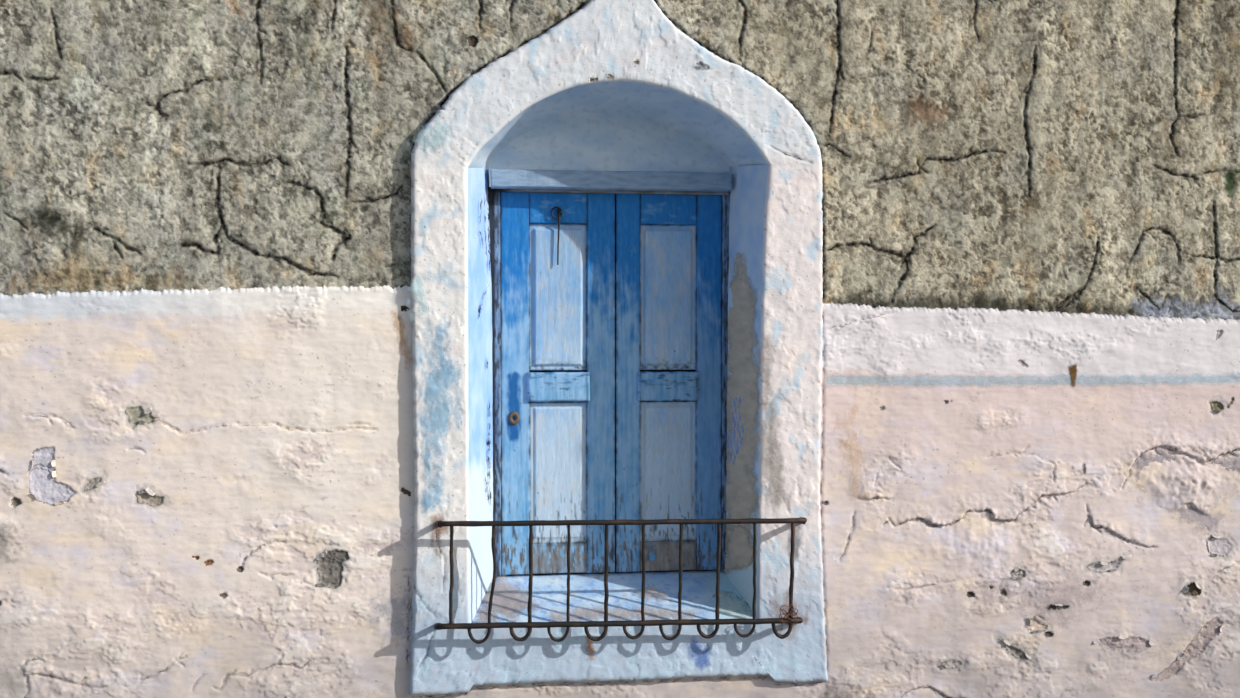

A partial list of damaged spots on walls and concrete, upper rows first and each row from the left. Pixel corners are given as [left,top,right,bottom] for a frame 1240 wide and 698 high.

crack [1157,0,1236,182]
crack [874,57,1036,195]
crack [180,54,402,277]
crack [1134,206,1240,312]
rust [1069,365,1077,387]
spalling [126,406,161,428]
peeling [11,446,105,508]
crack [820,432,1081,562]
spalling [315,549,349,589]
spalling [1083,554,1132,586]
spalling [1026,604,1070,637]
peeling [1150,616,1223,682]